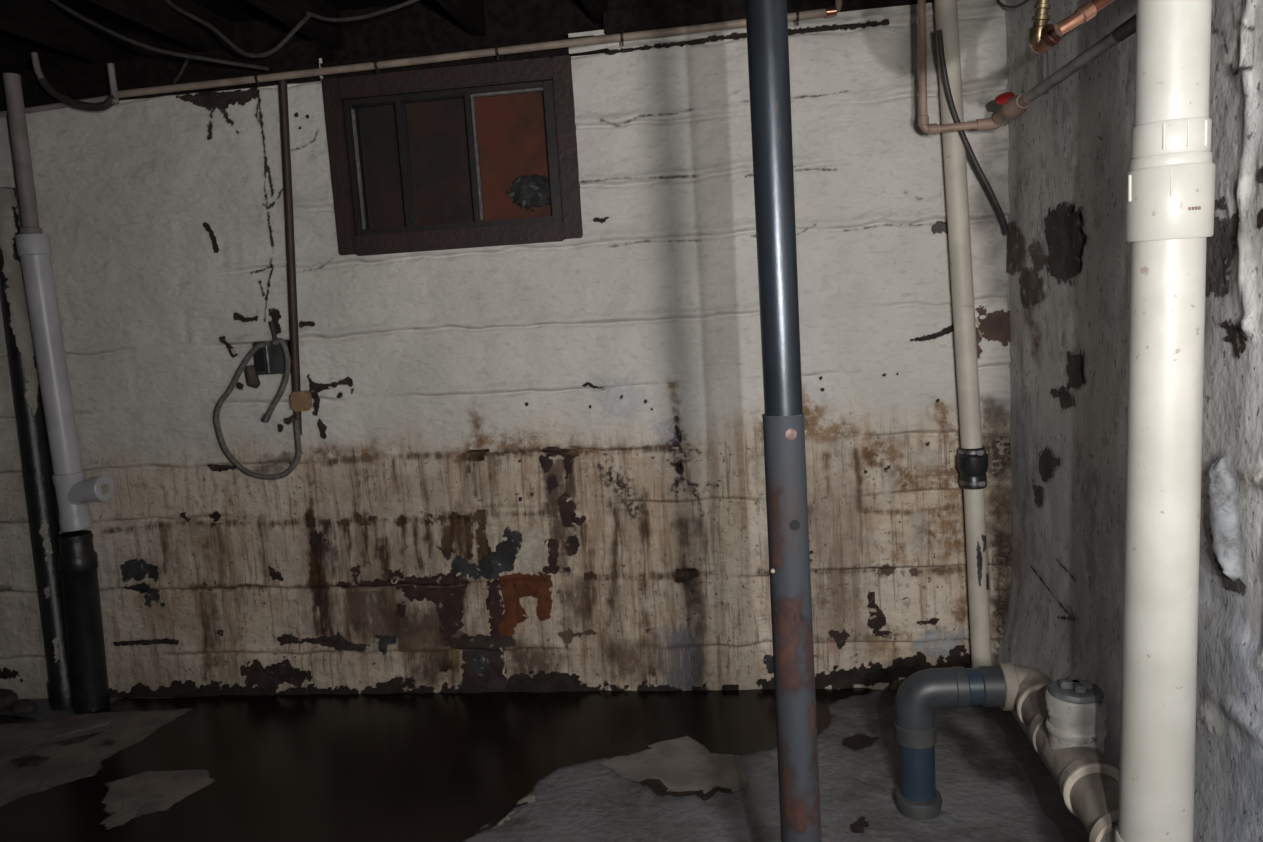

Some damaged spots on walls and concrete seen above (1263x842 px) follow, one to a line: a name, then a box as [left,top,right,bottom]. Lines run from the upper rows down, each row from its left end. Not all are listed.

peeling [176,87,260,109]
peeling [975,201,1084,358]
peeling [1050,349,1083,409]
leakage [597,464,639,518]
leakage [984,400,1012,575]
peeling [337,446,586,693]
leakage [517,527,544,572]
peeling [240,632,397,692]
leakage [109,584,739,698]
rust [776,598,815,761]
peeling [867,592,892,639]
leakage [815,645,972,689]